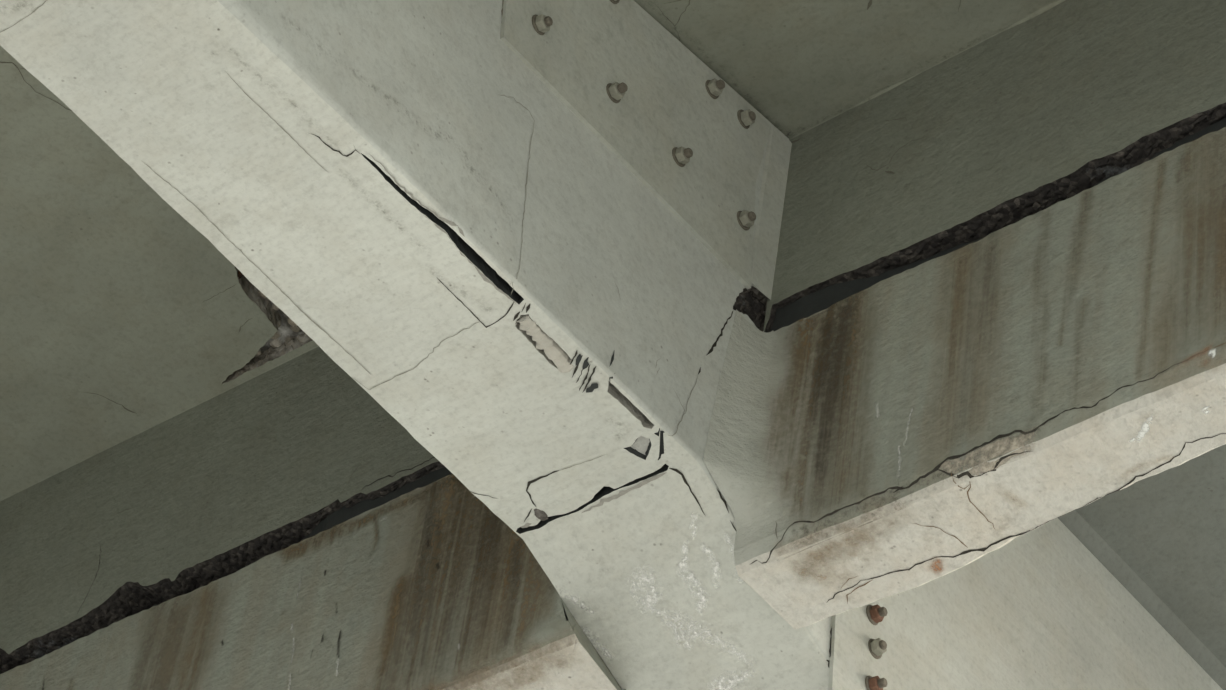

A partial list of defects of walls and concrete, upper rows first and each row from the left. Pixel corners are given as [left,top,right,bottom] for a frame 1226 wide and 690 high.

crack [0,62,72,111]
spalling [733,103,1226,333]
spalling [0,461,452,674]
spalling [222,267,312,384]
crack [516,311,736,534]
leakage [632,516,751,690]
crack [749,343,1226,604]